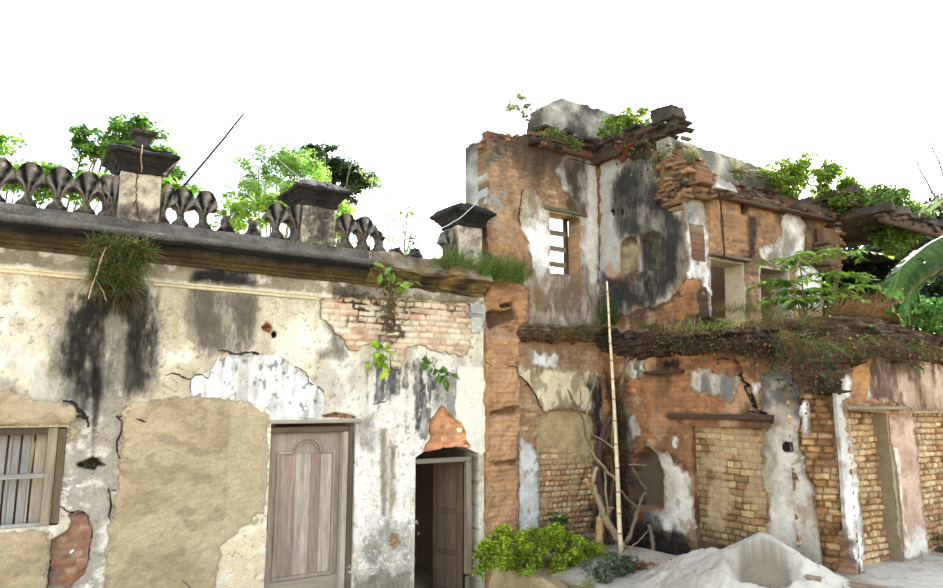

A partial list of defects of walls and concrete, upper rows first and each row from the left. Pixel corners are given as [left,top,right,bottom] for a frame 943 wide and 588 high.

leakage [535,156,682,322]
leakage [56,282,157,406]
flaking render [320,297,472,371]
crack [62,400,90,427]
crack [116,415,147,458]
flaking render [190,352,355,419]
flaking render [423,406,471,452]
crack [716,357,768,415]
flaking render [47,457,105,588]